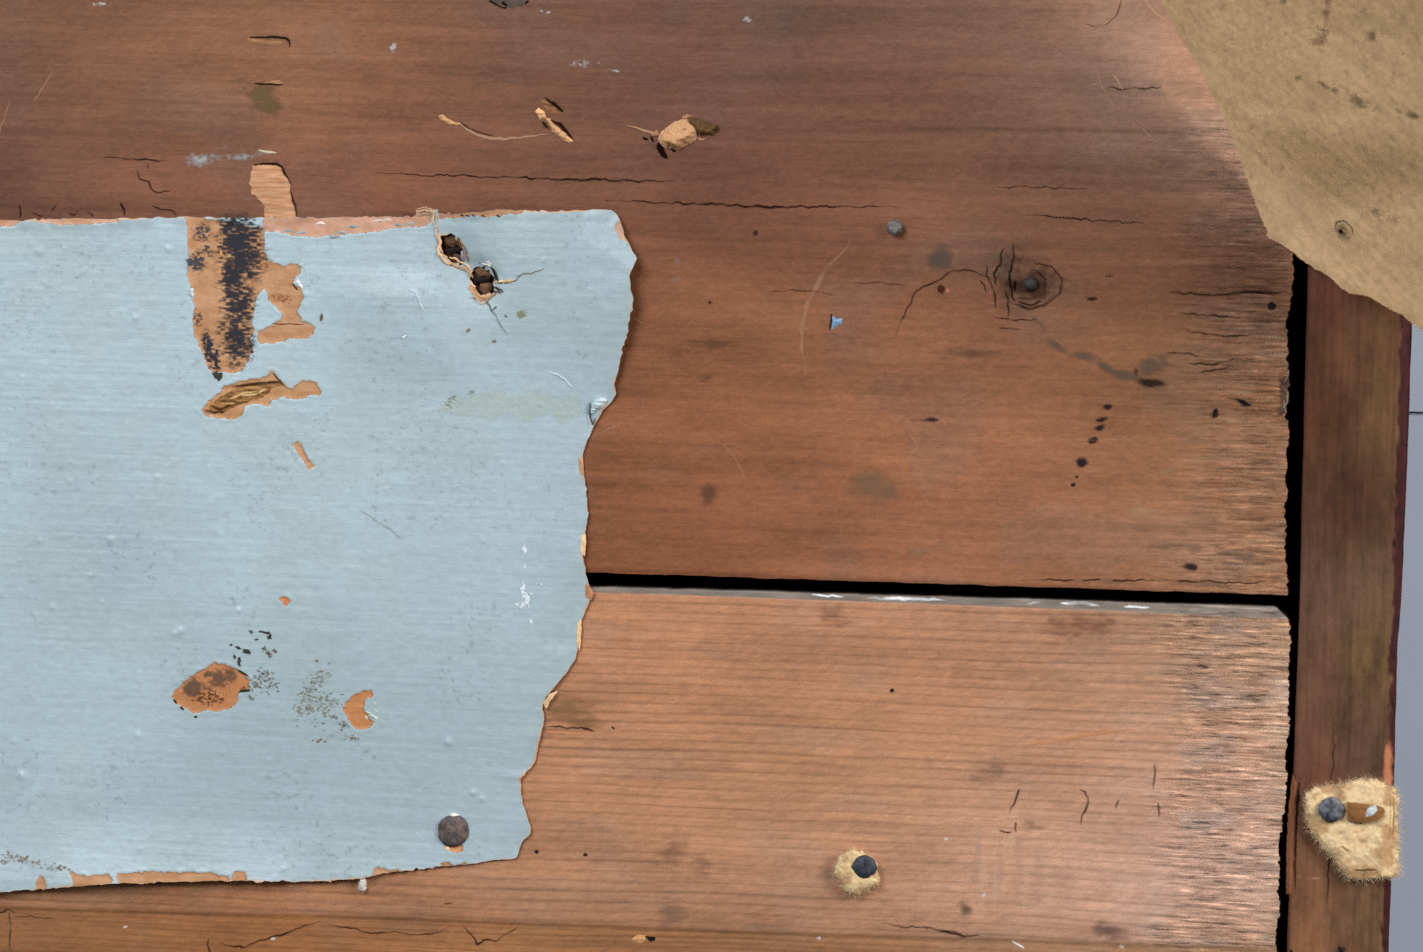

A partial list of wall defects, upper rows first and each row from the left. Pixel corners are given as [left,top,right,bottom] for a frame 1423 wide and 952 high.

crack [375,173,881,209]
peeling [184,208,523,419]
peeling [293,441,314,470]
peeling [171,662,250,718]
peeling [343,690,378,730]
peeling [36,876,47,890]
peeling [70,870,247,887]
crack [207,925,517,952]